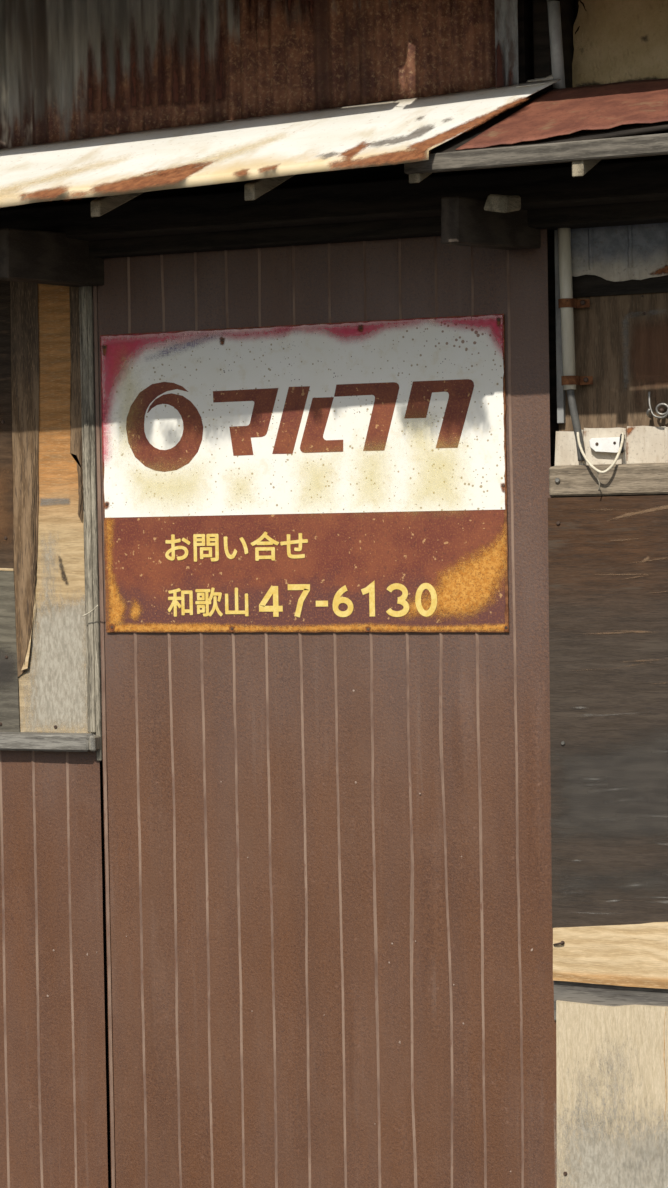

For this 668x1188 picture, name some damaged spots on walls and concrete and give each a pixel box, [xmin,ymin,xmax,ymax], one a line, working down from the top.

corrosion [87,6,225,112]